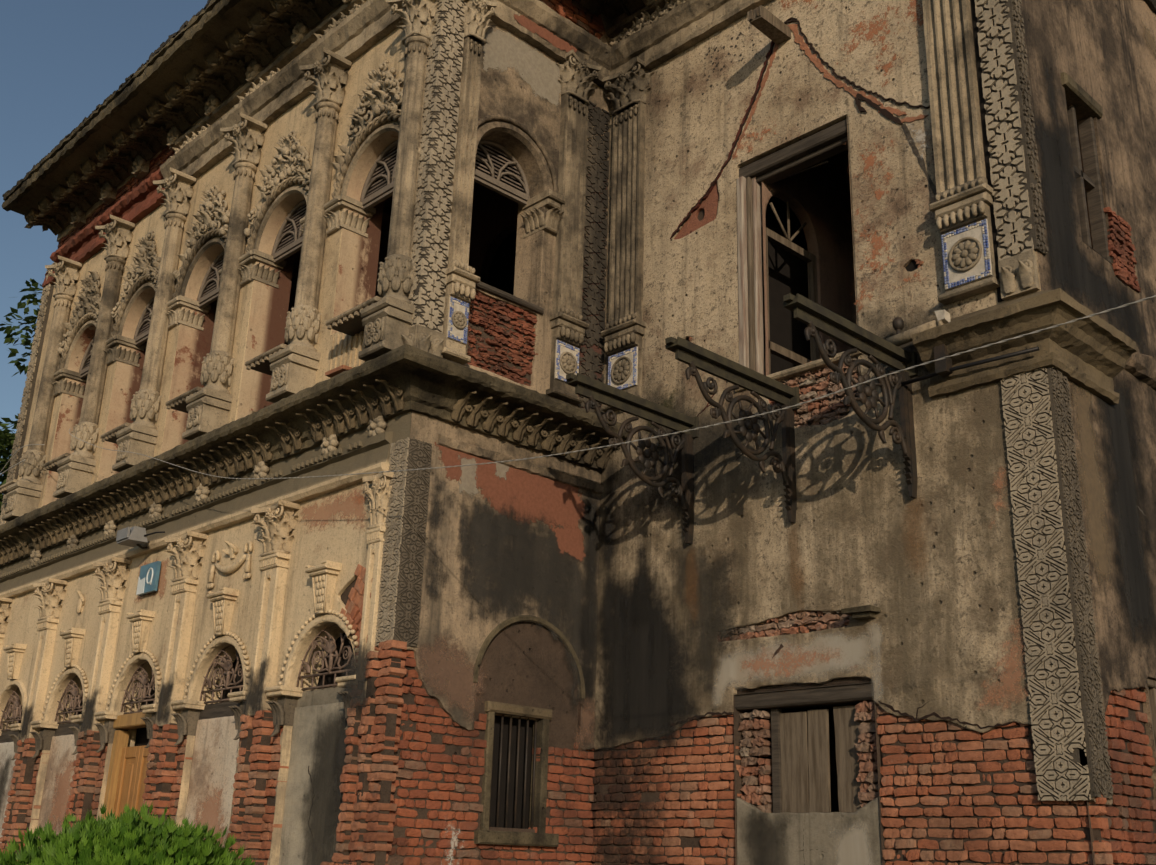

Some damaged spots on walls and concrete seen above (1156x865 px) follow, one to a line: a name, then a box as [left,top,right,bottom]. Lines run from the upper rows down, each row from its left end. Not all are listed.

spalling [539,0,606,39]
peeling [836,0,924,87]
crack [670,17,937,239]
peeling [848,134,926,312]
flaking render [1103,207,1141,293]
peeling [435,442,586,562]
damp [426,467,880,750]
spalling [723,611,850,677]
flaking render [320,564,745,865]
peeling [195,789,224,847]
flaking render [875,688,1156,865]